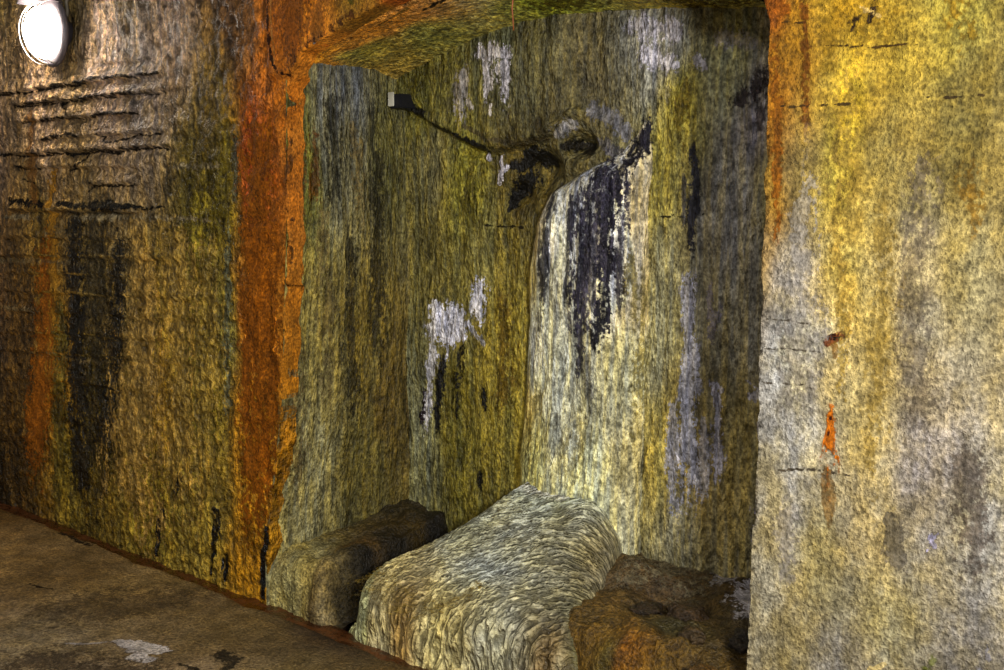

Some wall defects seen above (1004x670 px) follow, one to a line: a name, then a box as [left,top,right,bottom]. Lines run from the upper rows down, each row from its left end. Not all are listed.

corrosion [23,107,63,495]
crack [0,71,170,212]
damp [0,191,236,559]
corrosion [235,78,320,546]
corrosion [274,0,331,68]
damp [419,275,519,434]
damp [452,40,512,126]
damp [457,153,509,248]
damp [537,116,654,452]
damp [623,0,769,516]
corrosion [767,0,811,124]
corrosion [822,404,840,480]